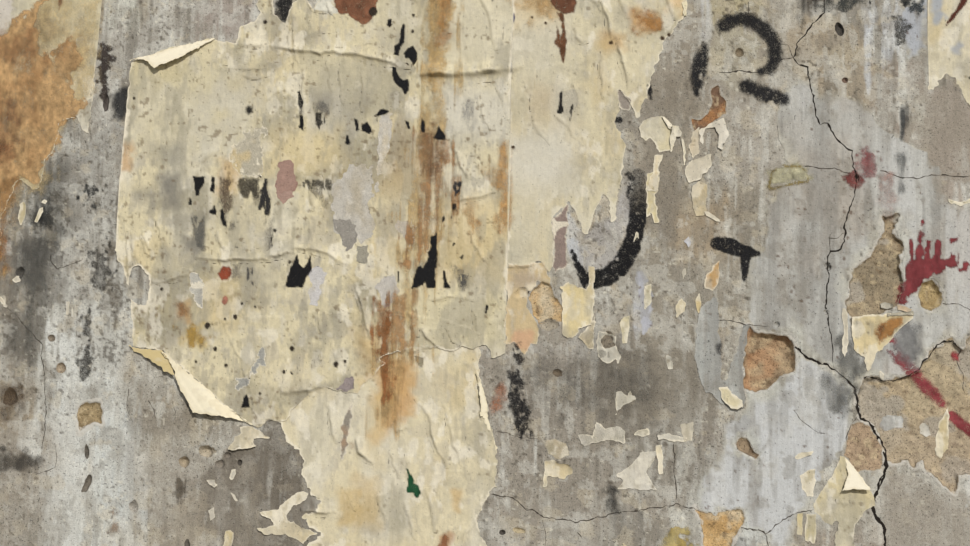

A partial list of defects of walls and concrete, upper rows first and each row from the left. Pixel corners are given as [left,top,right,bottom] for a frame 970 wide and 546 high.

rust [0,0,98,275]
rust [391,0,463,269]
spalling [75,398,105,459]
spalling [199,445,242,468]
rust [370,287,425,434]
crack [492,444,707,543]
peeling [691,78,970,546]
crack [720,0,968,546]